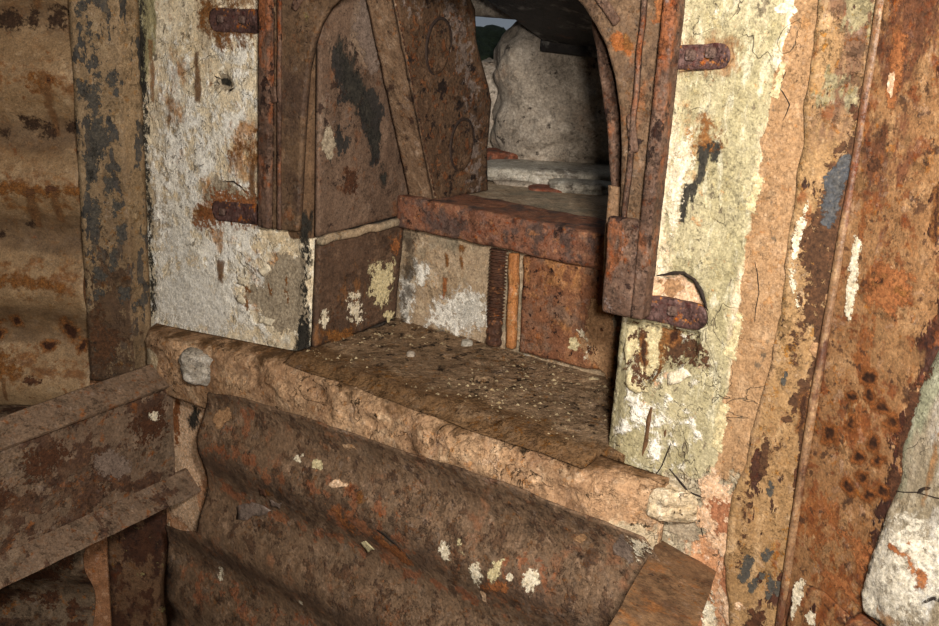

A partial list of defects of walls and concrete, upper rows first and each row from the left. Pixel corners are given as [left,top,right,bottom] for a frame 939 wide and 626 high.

rust [0,0,69,31]
rust [196,0,258,52]
flaking render [770,60,786,99]
rust [885,24,908,114]
peeling [74,0,128,284]
peeling [139,0,159,318]
rust [930,184,939,255]
rust [40,318,88,356]
peeling [669,85,863,626]
rust [820,235,939,503]
crack [896,486,939,499]
rust [809,526,880,620]